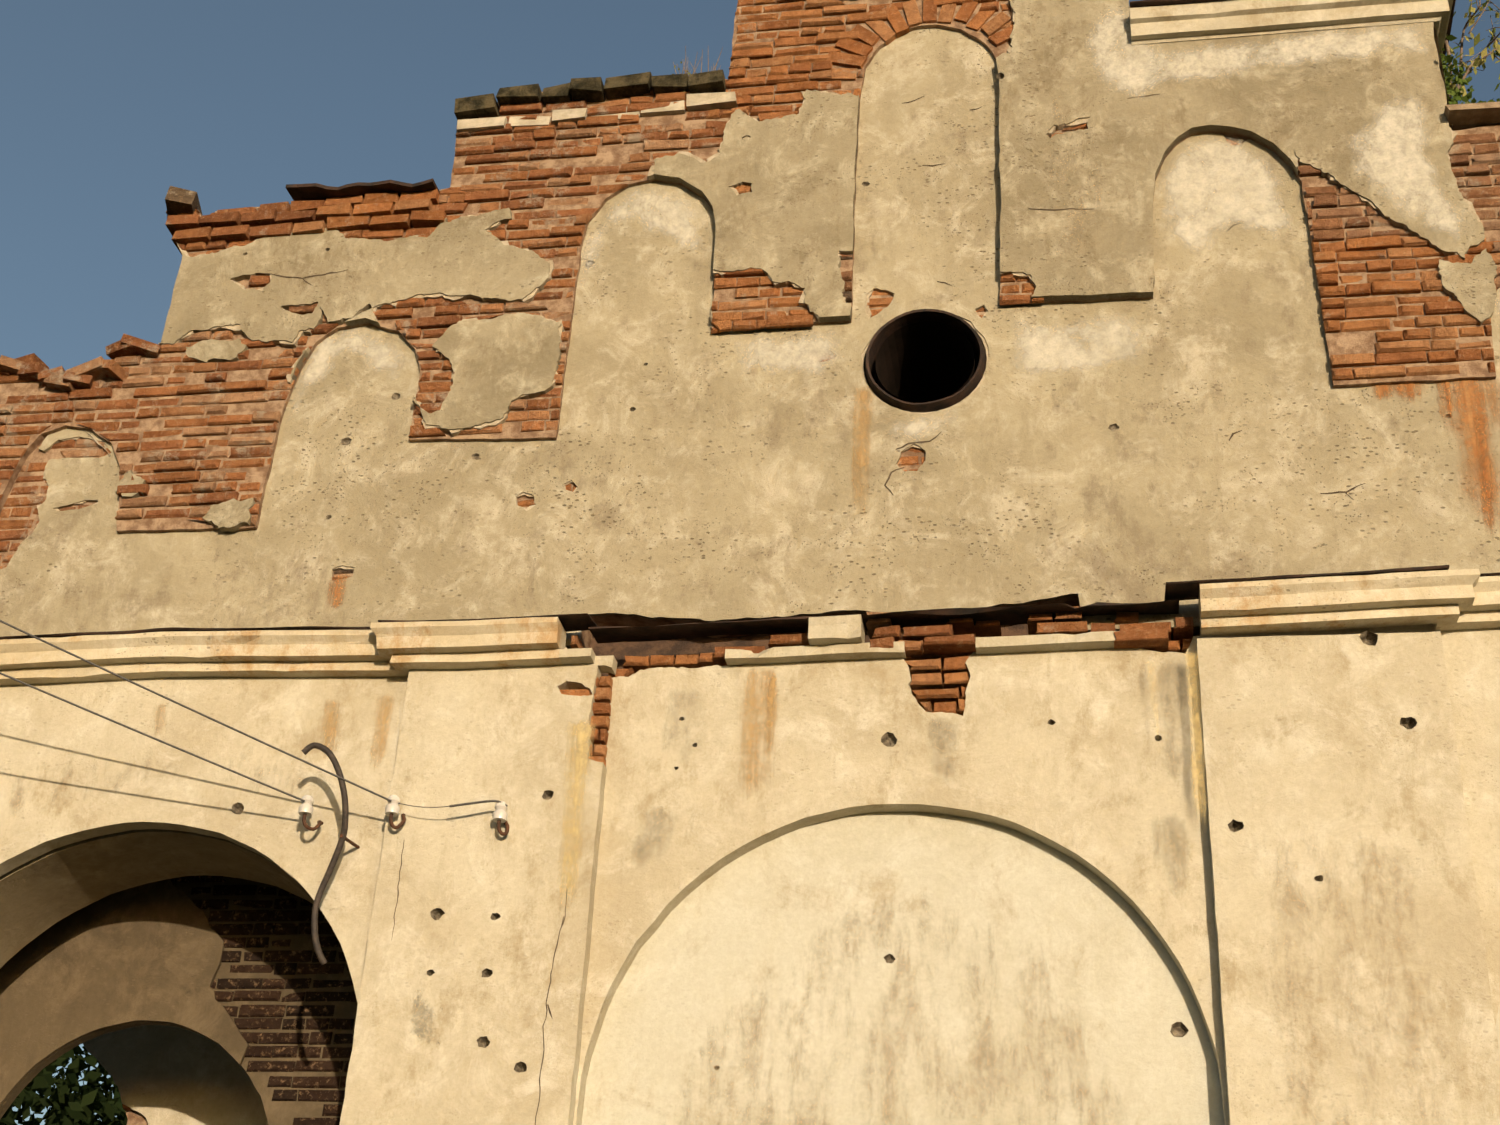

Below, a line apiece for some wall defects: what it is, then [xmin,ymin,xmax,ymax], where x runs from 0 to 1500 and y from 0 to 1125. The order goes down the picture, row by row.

spalling [166,207,259,257]
spalling [249,275,270,287]
spalling [326,0,1014,438]
spalling [976,274,1044,318]
spalling [1298,133,1500,381]
spalling [0,303,339,569]
rust [1438,379,1498,526]
spalling [332,569,354,581]
flaking render [1027,606,1194,653]
spalling [560,676,613,767]
spalling [881,732,897,747]
spalling [171,875,357,1125]